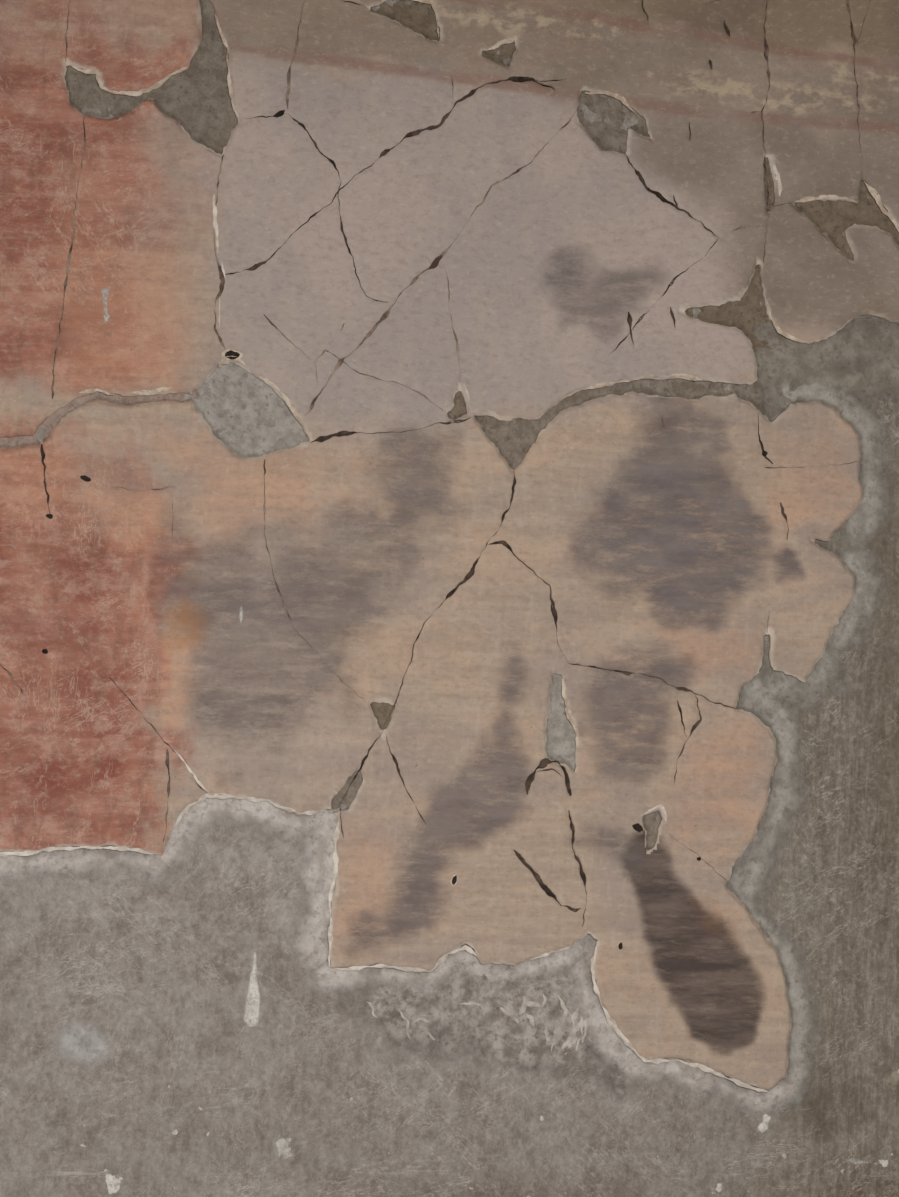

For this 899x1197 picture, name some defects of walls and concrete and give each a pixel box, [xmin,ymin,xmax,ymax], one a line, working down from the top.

flaking render [65,0,239,154]
crack [213,0,579,443]
crack [610,0,792,354]
flaking render [794,181,899,260]
flaking render [685,265,810,352]
flaking render [0,348,310,458]
flaking render [447,374,764,470]
damp [590,450,765,622]
crack [340,470,734,834]
damp [355,717,525,946]
crack [514,758,587,927]
damp [625,832,760,1051]